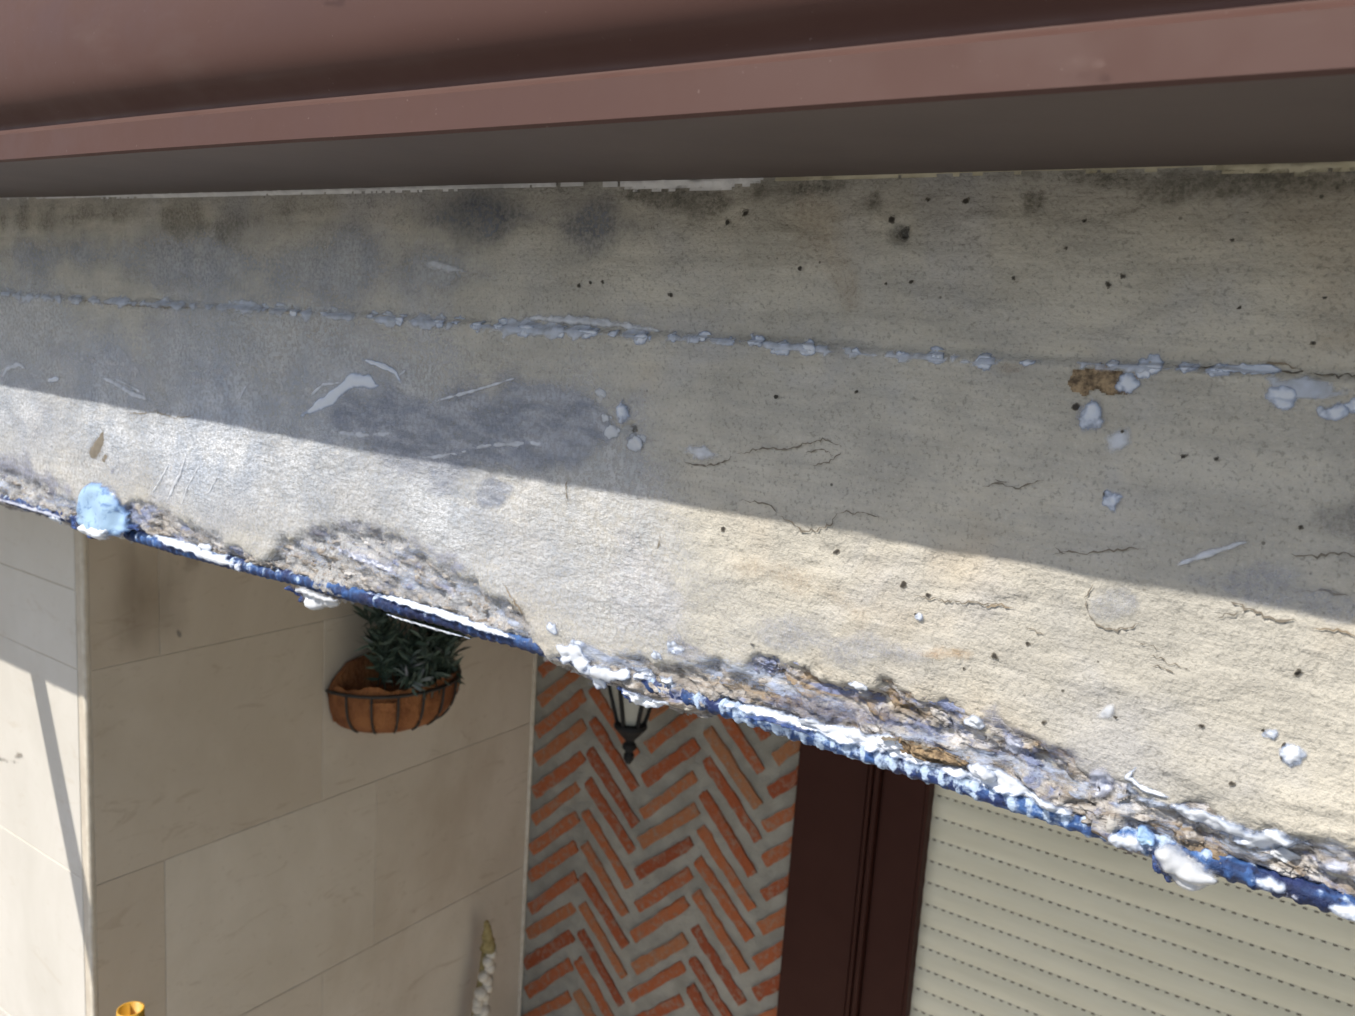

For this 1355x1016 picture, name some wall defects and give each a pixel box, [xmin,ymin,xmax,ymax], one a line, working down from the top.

peeling [1068,355,1164,396]
peeling [1265,386,1297,410]
peeling [1317,398,1355,420]
peeling [89,430,108,462]
leakage [0,232,679,641]
crack [685,437,841,467]
spalling [0,469,79,528]
crack [743,499,883,532]
spalling [105,500,557,641]
spalling [549,640,1355,897]